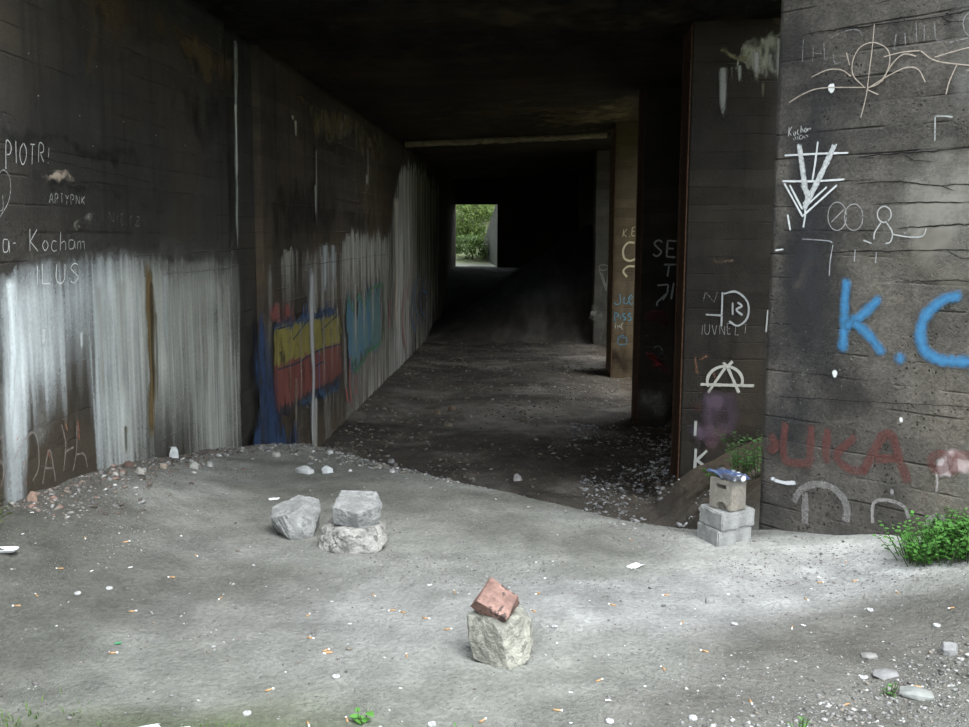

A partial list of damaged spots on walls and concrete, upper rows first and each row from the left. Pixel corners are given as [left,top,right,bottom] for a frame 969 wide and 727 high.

damp [156,18,238,235]
corrosion [146,264,158,434]